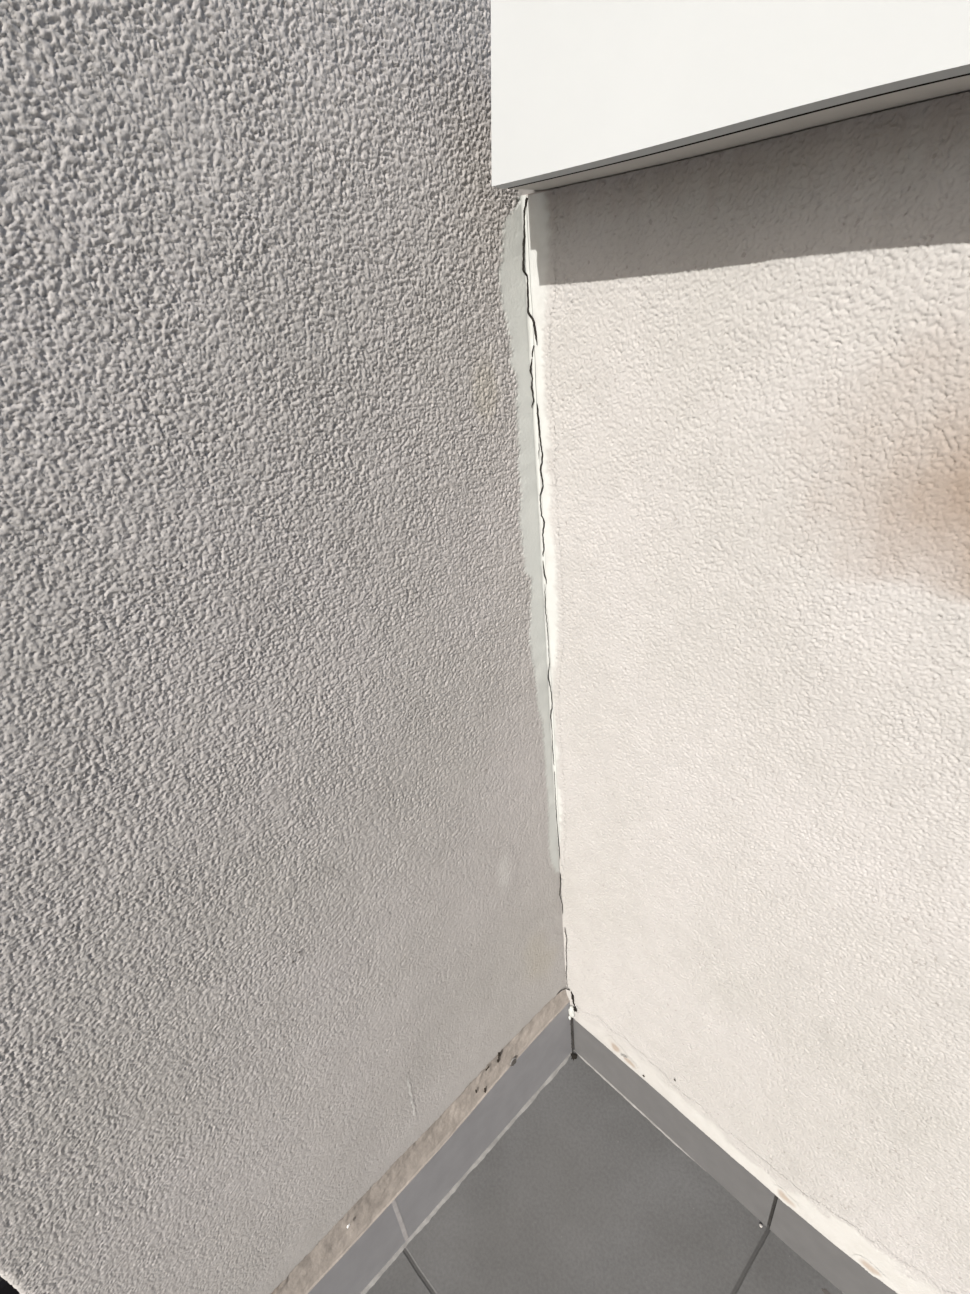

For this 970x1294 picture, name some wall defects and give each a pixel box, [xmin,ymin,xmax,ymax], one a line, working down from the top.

crack [522,198,567,984]